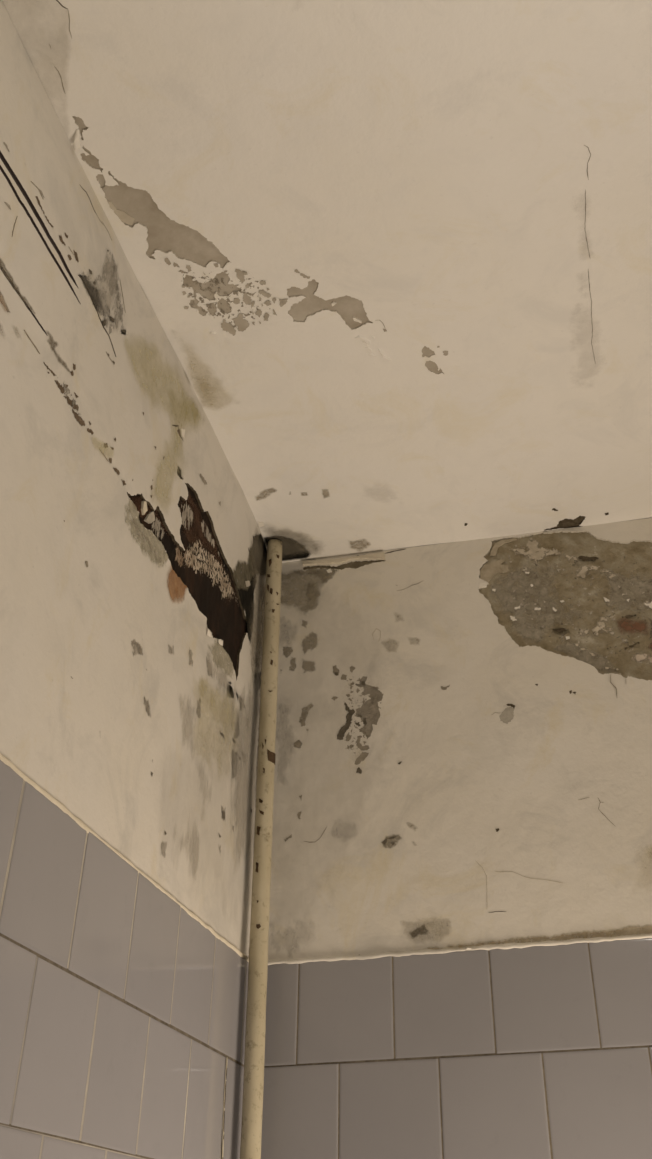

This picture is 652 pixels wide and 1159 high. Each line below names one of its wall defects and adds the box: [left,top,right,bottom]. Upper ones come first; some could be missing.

crack [0,155,72,287]
flaking render [31,181,126,364]
flaking render [73,116,387,336]
crack [584,145,596,364]
peeling [24,330,94,434]
damp [126,500,168,564]
spalling [99,438,248,674]
damp [208,641,233,686]
damp [219,521,323,854]
peeling [332,665,383,774]
flaking render [479,508,652,695]